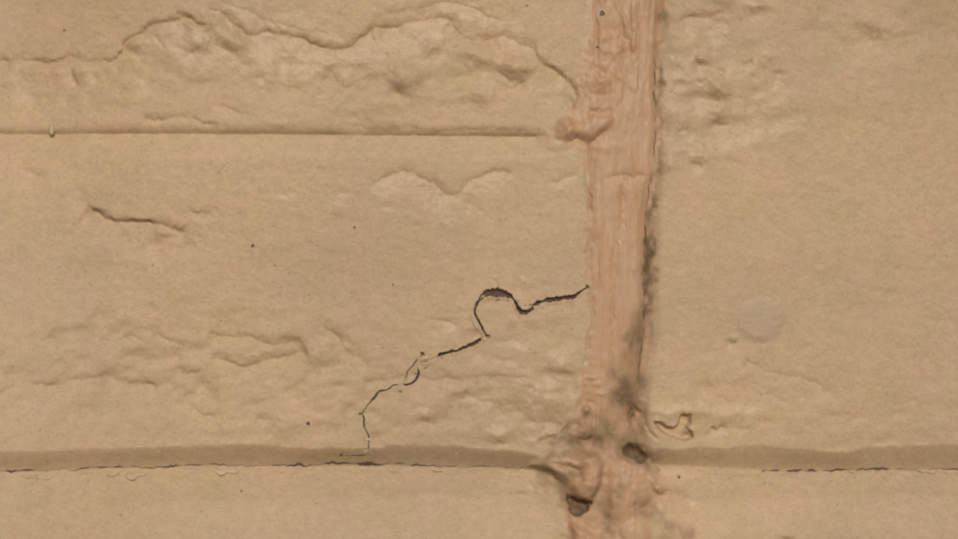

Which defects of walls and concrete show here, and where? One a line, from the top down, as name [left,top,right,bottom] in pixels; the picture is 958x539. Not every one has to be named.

spalling [0,0,581,125]
spalling [141,101,302,140]
spalling [340,121,528,140]
crack [5,283,589,473]
spalling [536,375,608,450]
spalling [654,415,693,442]
spalling [622,445,661,470]
hole [566,495,592,517]